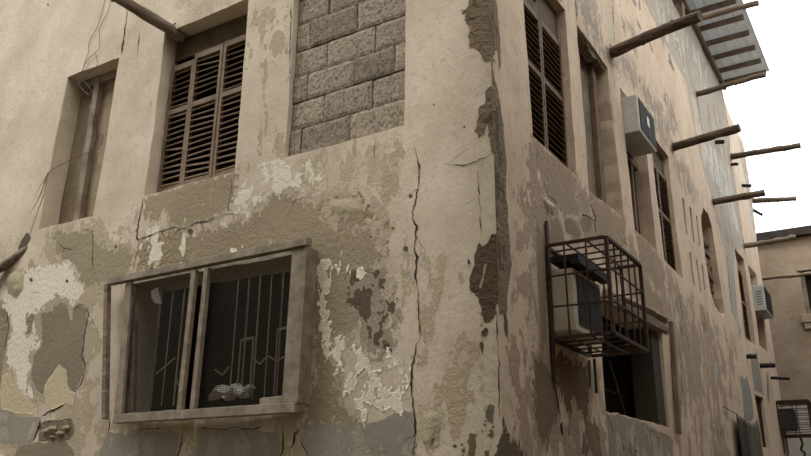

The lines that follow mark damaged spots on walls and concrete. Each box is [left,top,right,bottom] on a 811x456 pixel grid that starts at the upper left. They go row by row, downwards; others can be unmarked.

flaking render [0,259,87,414]
crack [128,182,263,271]
flaking render [136,157,413,431]
crack [400,147,424,456]
spalling [461,0,512,353]
crack [544,183,608,235]
flaking render [15,419,75,456]
crack [106,420,307,456]